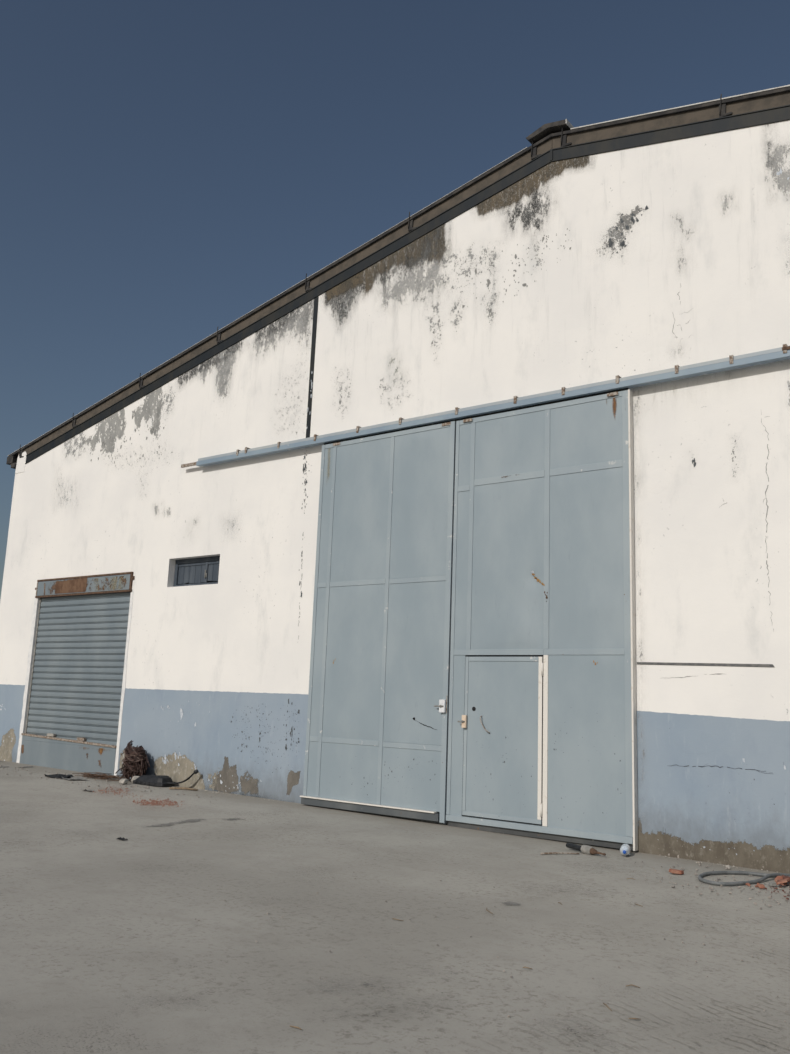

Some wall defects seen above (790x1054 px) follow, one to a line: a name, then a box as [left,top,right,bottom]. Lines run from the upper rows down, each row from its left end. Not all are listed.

damp [766,142,790,193]
damp [325,156,590,325]
damp [178,300,313,397]
crack [761,413,774,631]
corrosion [44,576,126,595]
spalling [0,729,16,762]
spalling [154,751,262,794]
spalling [231,699,301,795]
damp [637,820,790,874]